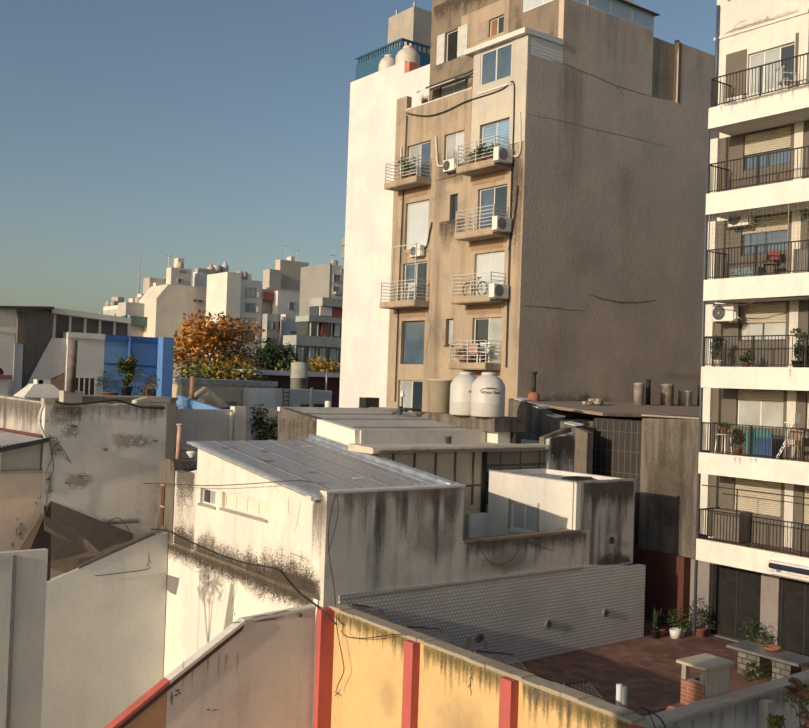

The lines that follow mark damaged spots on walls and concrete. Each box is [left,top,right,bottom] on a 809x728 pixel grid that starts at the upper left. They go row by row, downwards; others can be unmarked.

crack [551,59,658,98]
crack [529,114,671,148]
peeling [35,409,78,506]
peeling [103,433,158,452]
peeling [65,473,94,489]
damp [176,469,194,510]
damp [375,498,385,551]
damp [418,492,457,556]
damp [156,521,320,606]
damp [598,532,630,565]